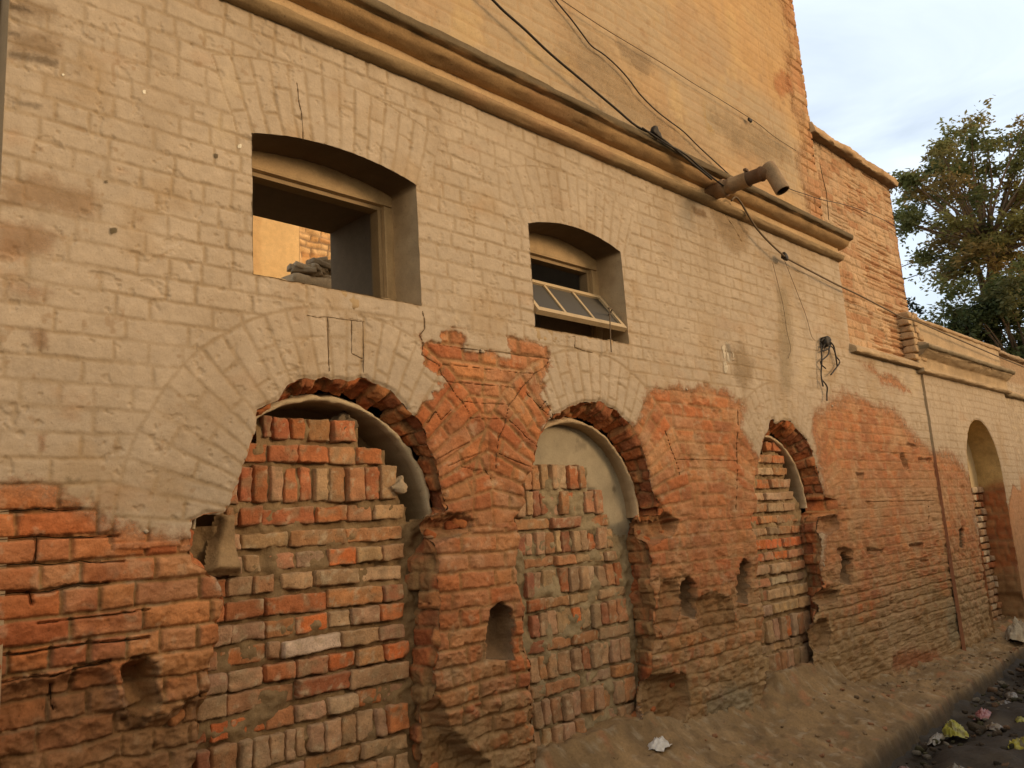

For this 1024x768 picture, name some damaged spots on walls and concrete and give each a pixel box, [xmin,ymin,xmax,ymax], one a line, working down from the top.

peeling [0,434,254,768]
crack [419,311,553,479]
peeling [256,331,994,768]
peeling [1008,485,1024,598]